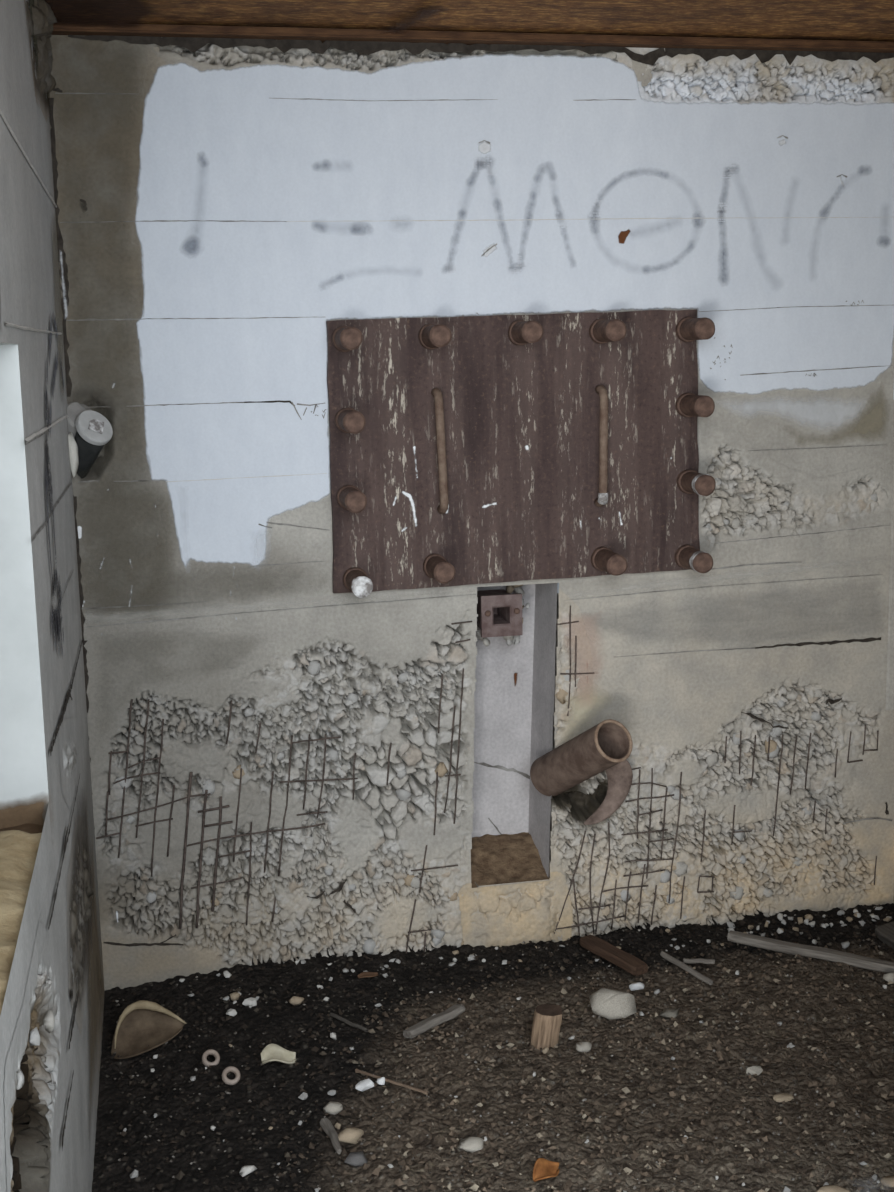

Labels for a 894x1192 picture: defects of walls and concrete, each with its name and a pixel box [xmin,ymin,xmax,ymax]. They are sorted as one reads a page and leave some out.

spalling [148,37,894,105]
spalling [554,606,594,716]
crack [619,637,881,657]
spalling [96,699,358,929]
spalling [327,668,522,981]
spalling [551,767,715,947]
flaking render [731,805,752,845]
spalling [724,724,811,836]
spalling [834,725,879,778]
spalling [4,920,73,1192]